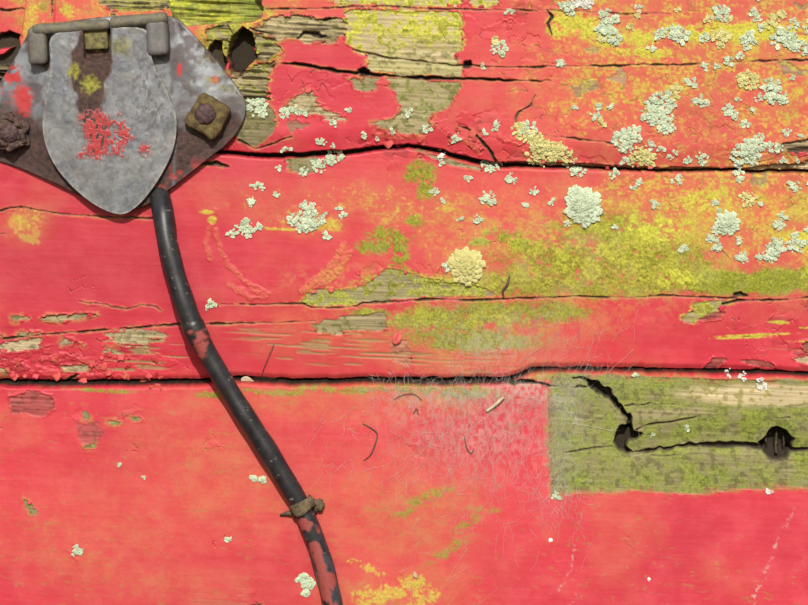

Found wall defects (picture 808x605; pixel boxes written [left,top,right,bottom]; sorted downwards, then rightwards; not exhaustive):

peeling [99,0,171,16]
peeling [313,0,502,136]
peeling [233,86,347,149]
crack [458,126,498,162]
crack [542,134,614,145]
peeling [0,312,100,355]
crack [0,301,182,341]
peeling [102,326,169,355]
crack [205,291,808,326]
peeling [682,300,728,324]
crack [507,376,762,458]
crack [784,443,808,453]